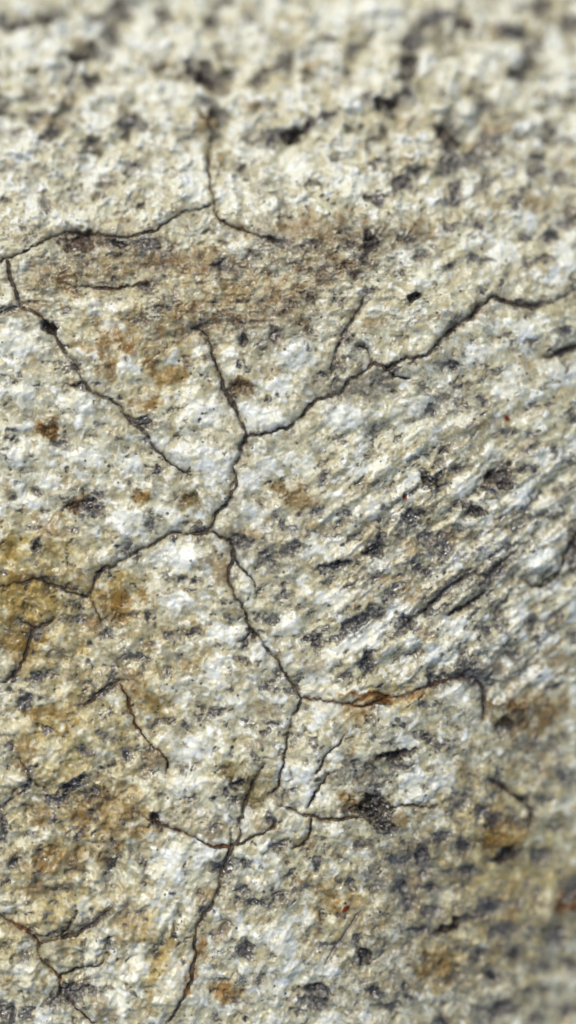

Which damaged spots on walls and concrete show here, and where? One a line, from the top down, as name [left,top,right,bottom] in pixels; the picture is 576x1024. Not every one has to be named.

crack [1,109,278,476]
crack [1,292,576,1023]